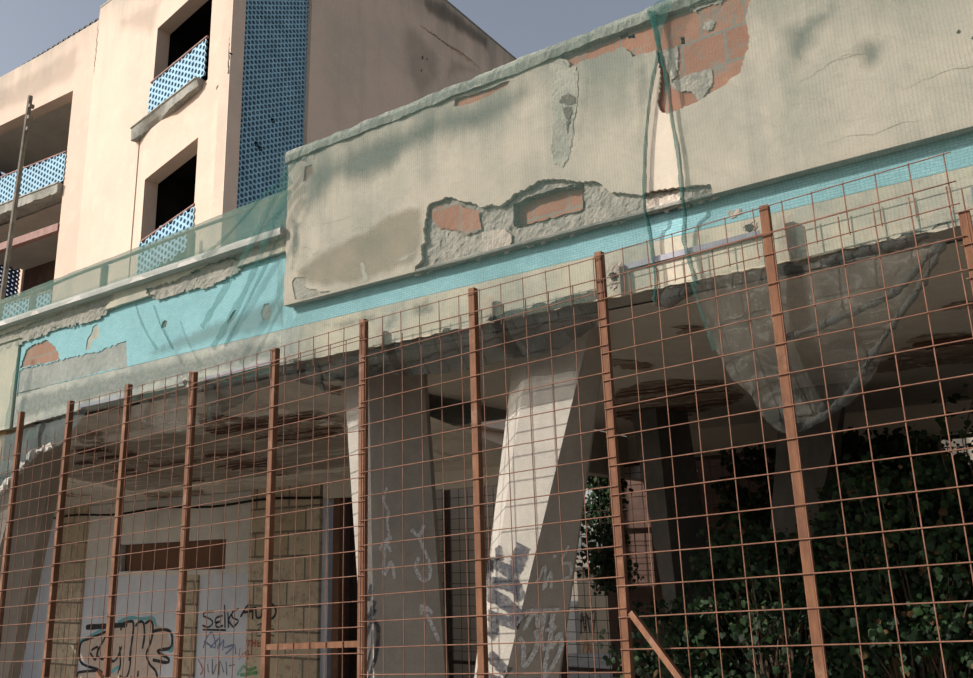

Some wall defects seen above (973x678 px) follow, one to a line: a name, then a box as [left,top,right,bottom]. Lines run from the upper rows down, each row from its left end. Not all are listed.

spalling [549,0,750,167]
spalling [414,180,720,276]
spalling [728,208,757,233]
spalling [147,253,245,301]
spalling [0,295,128,397]